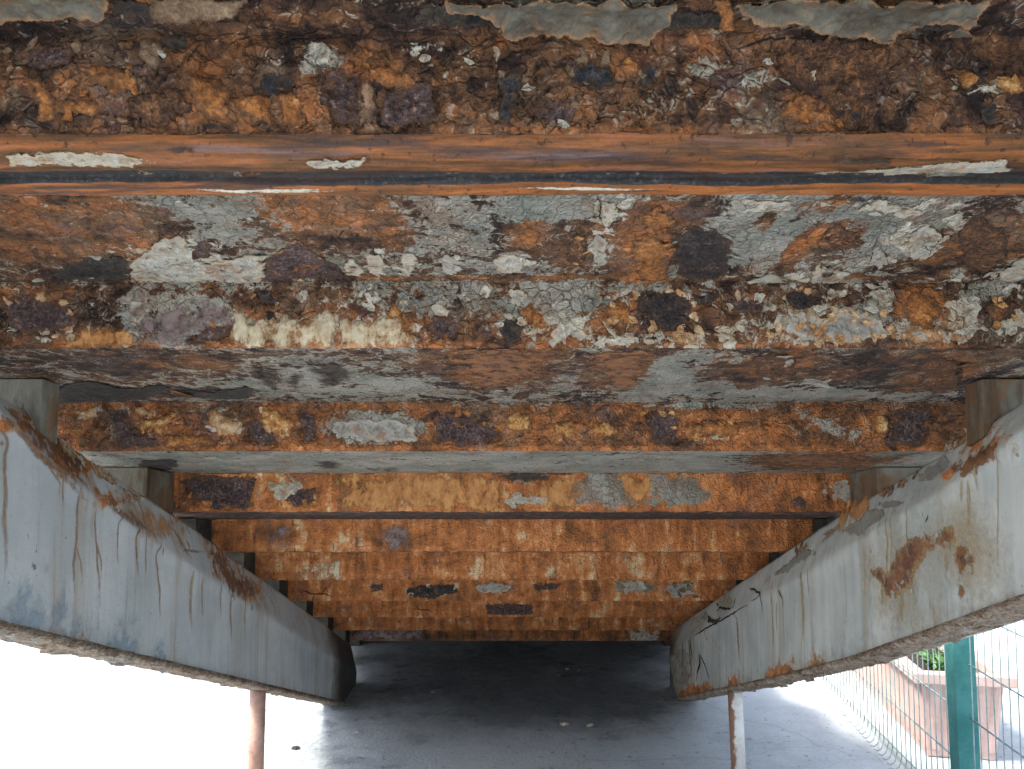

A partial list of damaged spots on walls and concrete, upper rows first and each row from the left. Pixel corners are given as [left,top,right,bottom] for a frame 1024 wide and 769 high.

rust [2,36,307,128]
rust [317,58,439,133]
rust [534,48,669,129]
rust [957,56,1024,95]
peeling [6,151,156,168]
peeling [127,236,267,284]
peeling [344,253,422,278]
peeling [493,253,525,274]
peeling [853,199,950,270]
peeling [765,264,980,348]
rust [869,439,998,615]
crack [690,588,783,681]